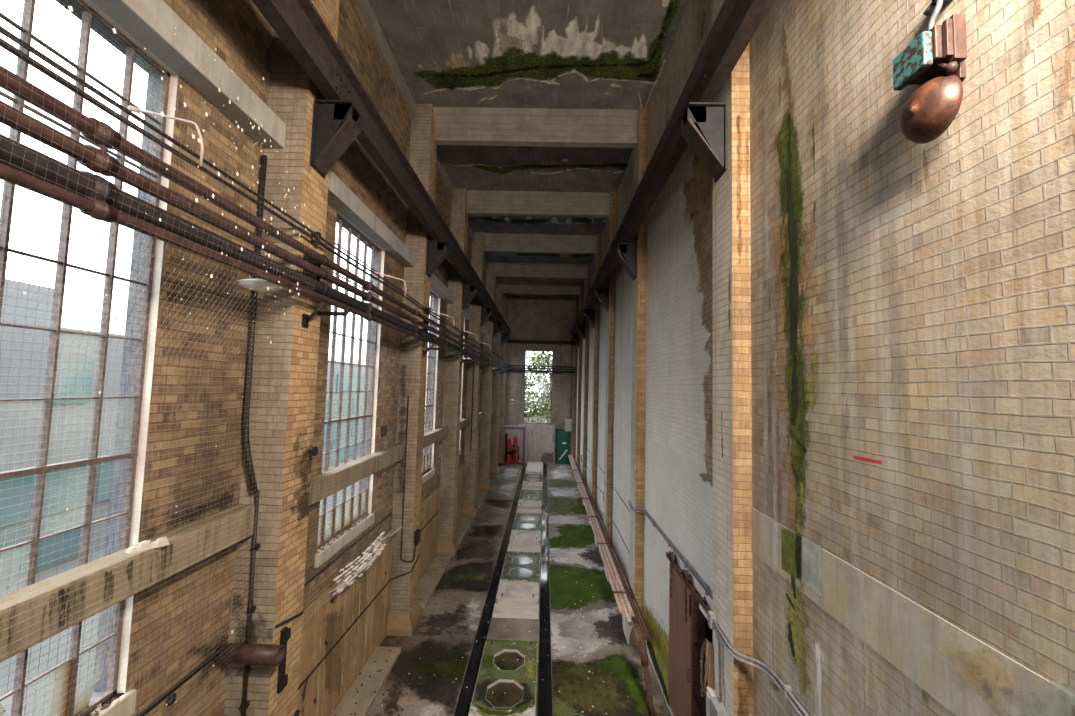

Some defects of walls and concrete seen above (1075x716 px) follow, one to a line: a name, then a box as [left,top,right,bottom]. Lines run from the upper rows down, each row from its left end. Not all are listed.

peeling [683,154,713,486]
water stain [781,114,807,482]
water stain [802,538,822,597]
water stain [943,642,1075,716]